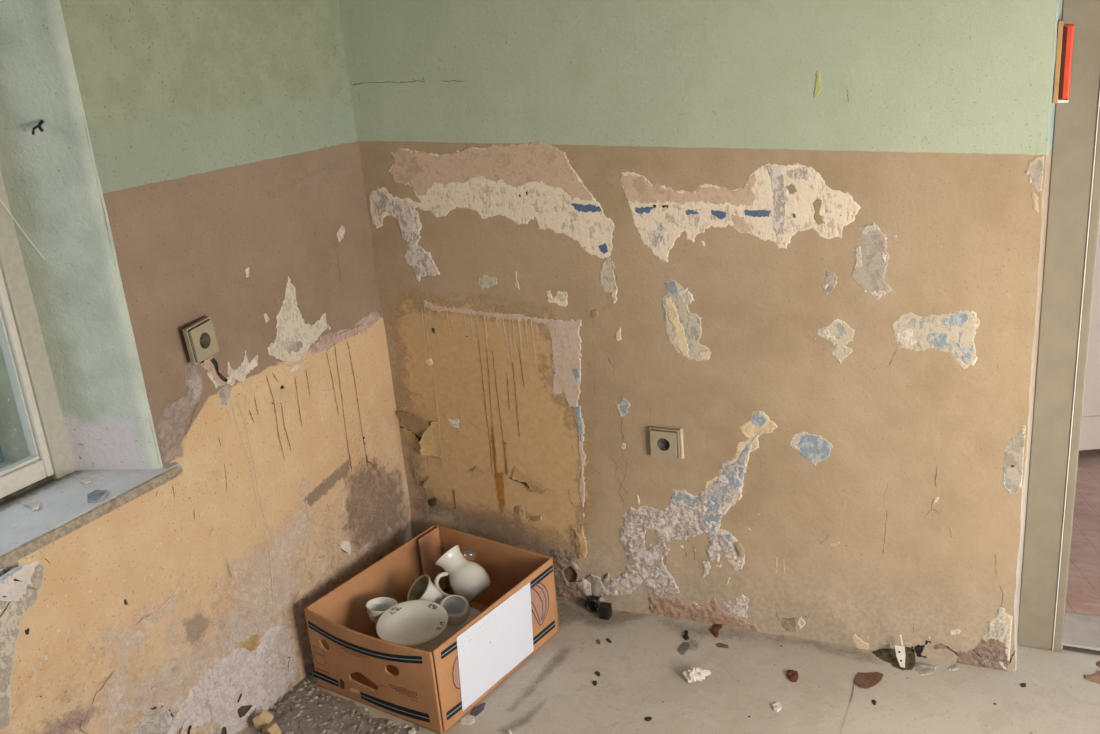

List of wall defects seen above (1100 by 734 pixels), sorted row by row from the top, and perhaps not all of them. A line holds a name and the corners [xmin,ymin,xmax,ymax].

peeling [369,141,618,304]
peeling [620,163,897,299]
peeling [218,276,331,509]
peeling [389,275,778,603]
peeling [789,431,833,466]
peeling [815,319,855,364]
peeling [889,310,980,369]
damp [47,342,405,734]
peeling [0,561,45,732]
spalling [130,706,192,734]
spalling [237,694,252,718]
spalling [872,607,1016,676]